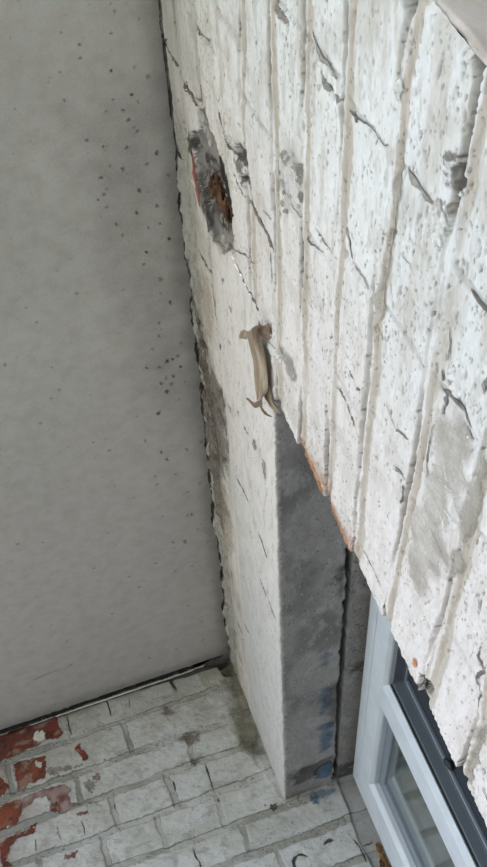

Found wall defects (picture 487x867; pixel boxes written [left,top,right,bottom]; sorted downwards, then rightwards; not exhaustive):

spalling [187,108,251,254]
damp [191,294,229,529]
peeling [0,717,89,867]